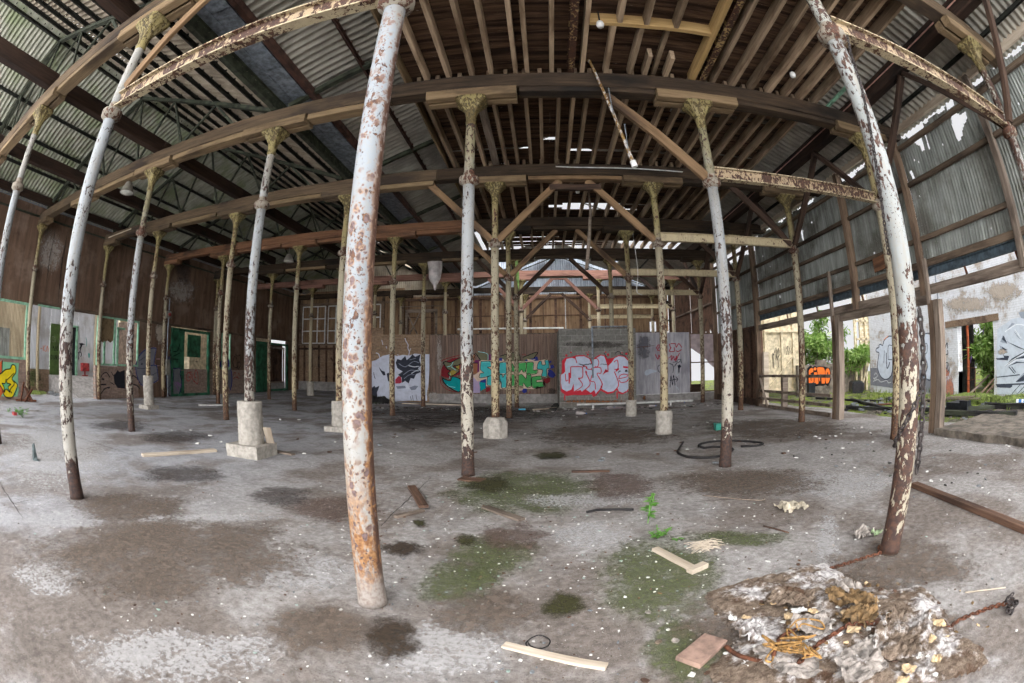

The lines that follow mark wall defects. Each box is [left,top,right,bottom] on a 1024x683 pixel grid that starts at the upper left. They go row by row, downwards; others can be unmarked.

damp [143,467,218,481]
damp [251,487,348,522]
damp [482,525,548,550]
damp [267,605,421,661]